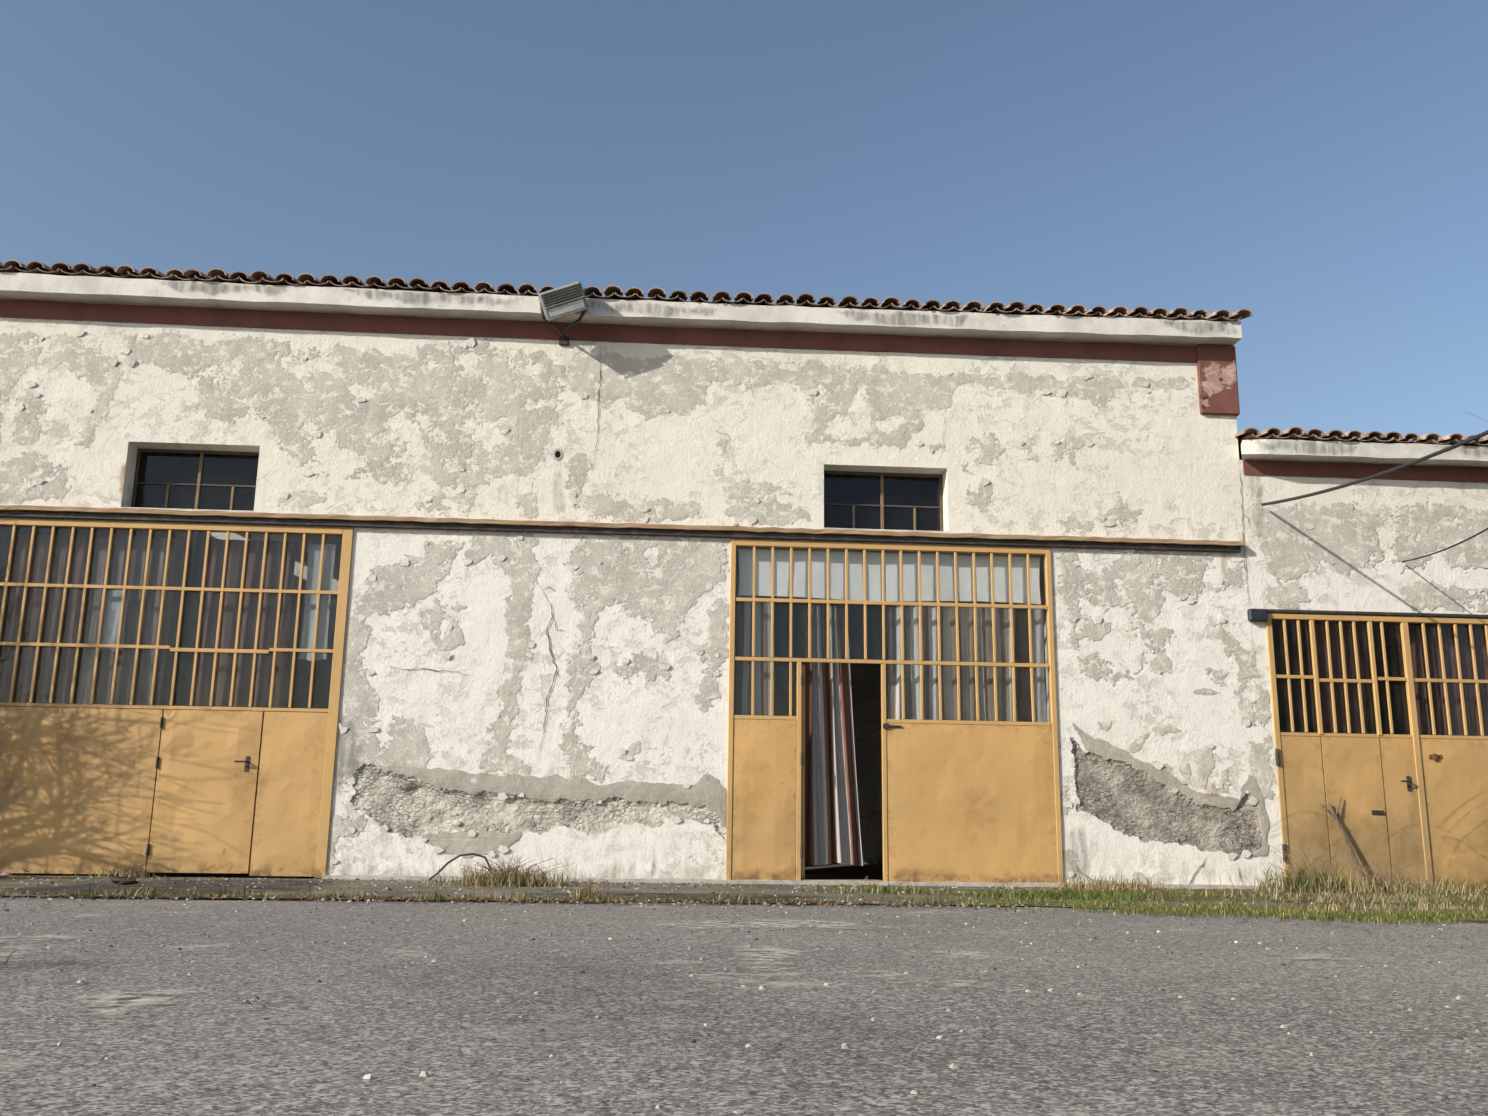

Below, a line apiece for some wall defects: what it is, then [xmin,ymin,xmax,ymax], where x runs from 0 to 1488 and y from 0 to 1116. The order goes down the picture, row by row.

crack [538,586,564,758]
peeling [0,328,1237,875]
spalling [1060,617,1276,860]
peeling [1056,491,1488,686]
peeling [1063,849,1079,884]